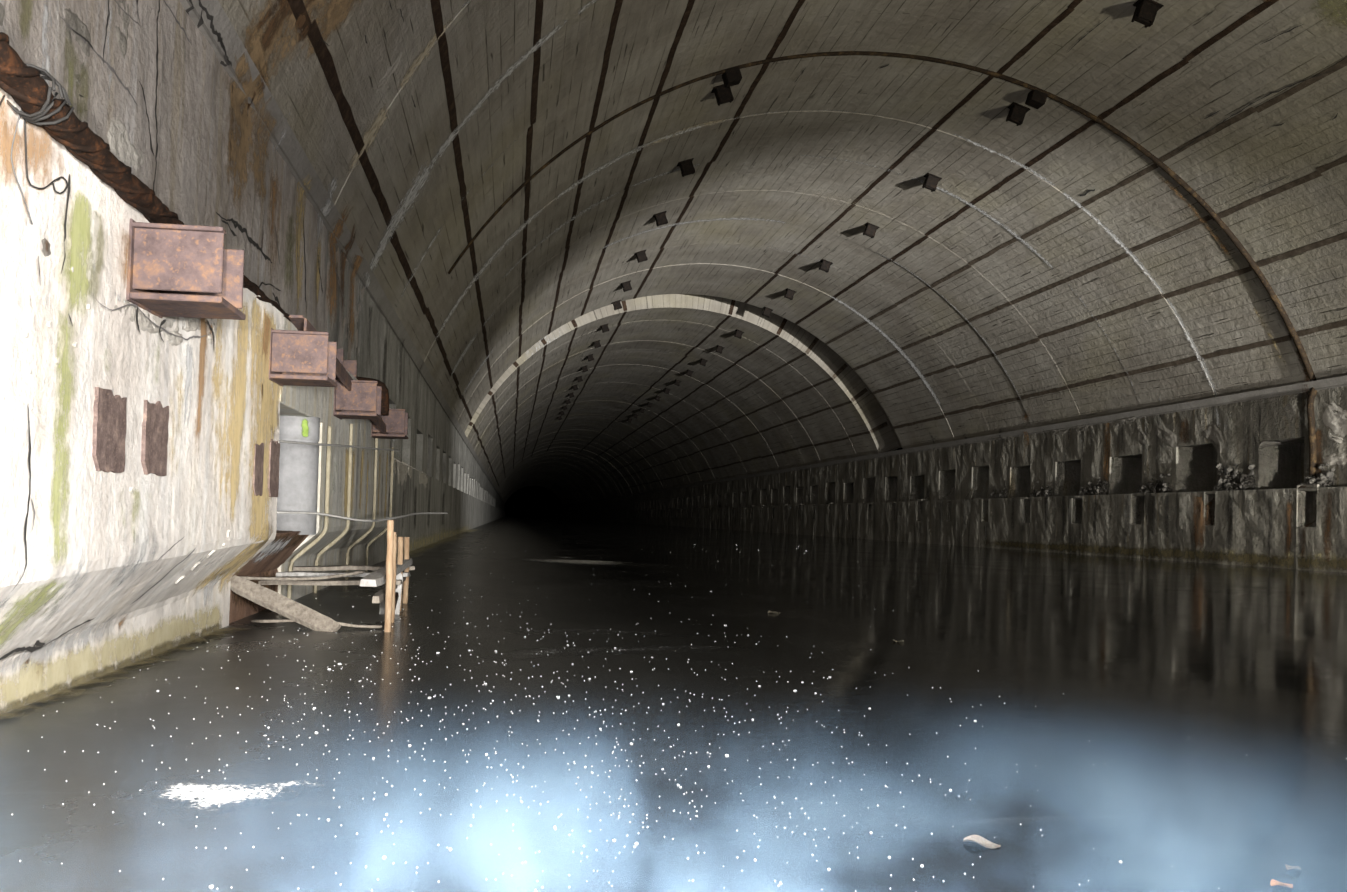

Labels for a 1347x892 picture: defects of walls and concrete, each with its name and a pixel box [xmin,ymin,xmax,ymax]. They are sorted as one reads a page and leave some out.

corrosion [0,102,52,181]
crack [61,0,232,195]
corrosion [227,0,361,262]
water stain [91,223,104,294]
corrosion [296,181,362,342]
crack [0,405,35,607]
water stain [52,320,73,560]
corrosion [196,299,304,608]
crack [0,617,96,660]
water stain [0,561,245,718]